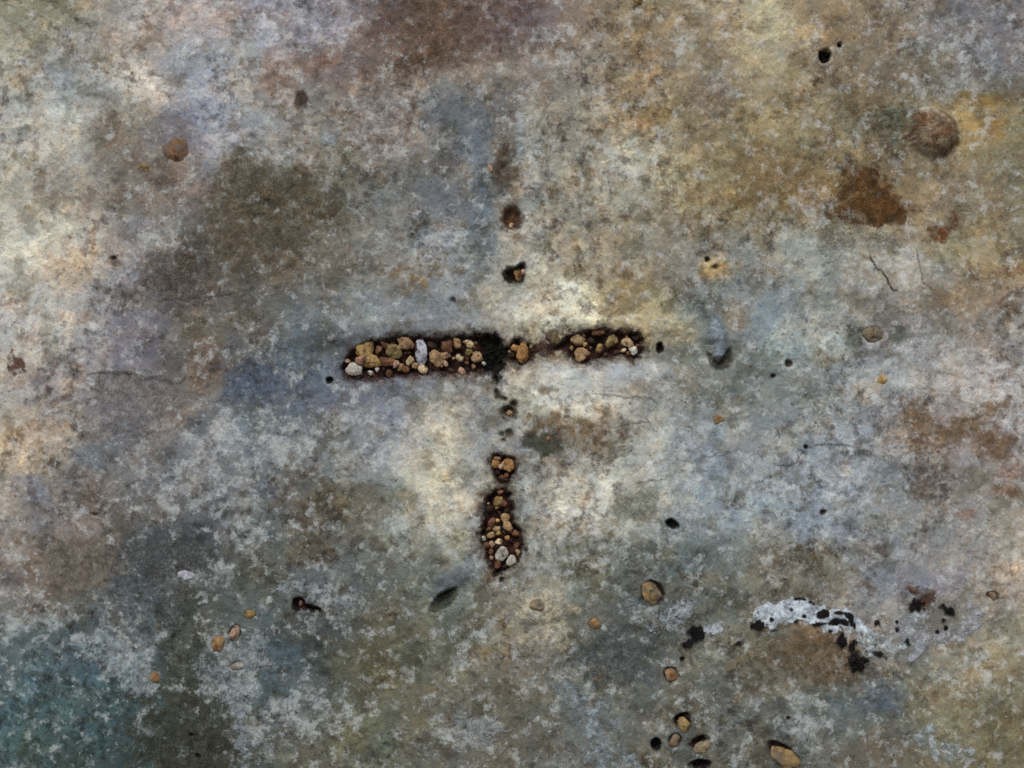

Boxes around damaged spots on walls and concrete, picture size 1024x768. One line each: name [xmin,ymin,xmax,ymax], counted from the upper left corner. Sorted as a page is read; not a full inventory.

rust [825,165,914,228]
spalling [326,327,664,582]
efflorescence [750,597,985,662]